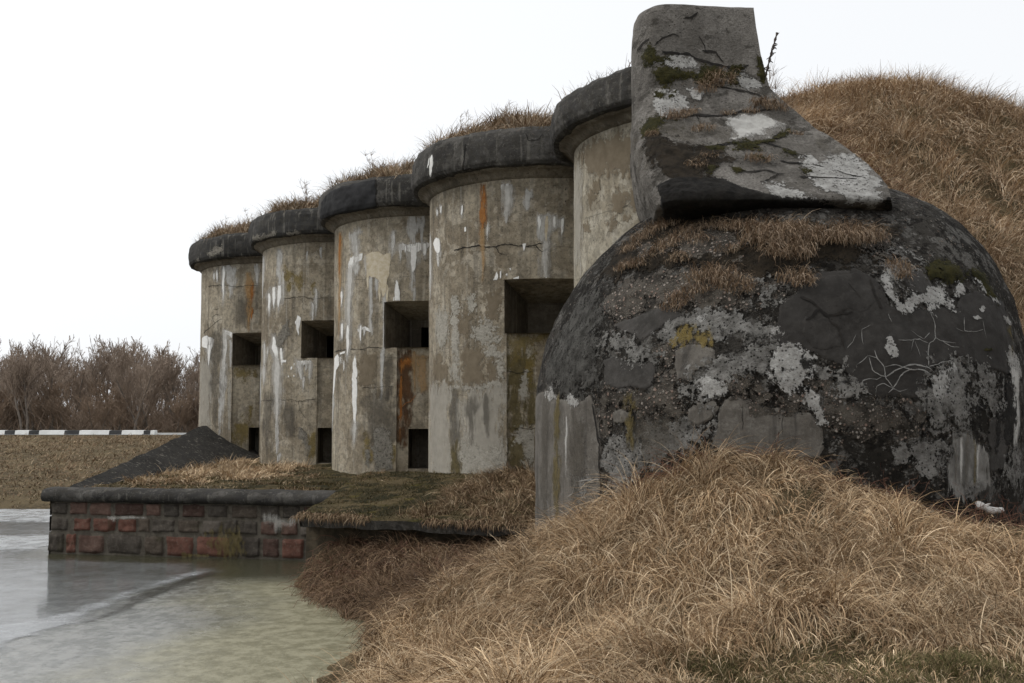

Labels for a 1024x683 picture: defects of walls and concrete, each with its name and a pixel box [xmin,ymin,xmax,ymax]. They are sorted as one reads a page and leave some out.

crack [637,12,861,182]
rust [479,185,489,269]
crack [454,242,549,254]
water stain [199,330,232,441]
water stain [332,216,440,443]
rust [396,349,427,447]
crack [800,279,985,395]